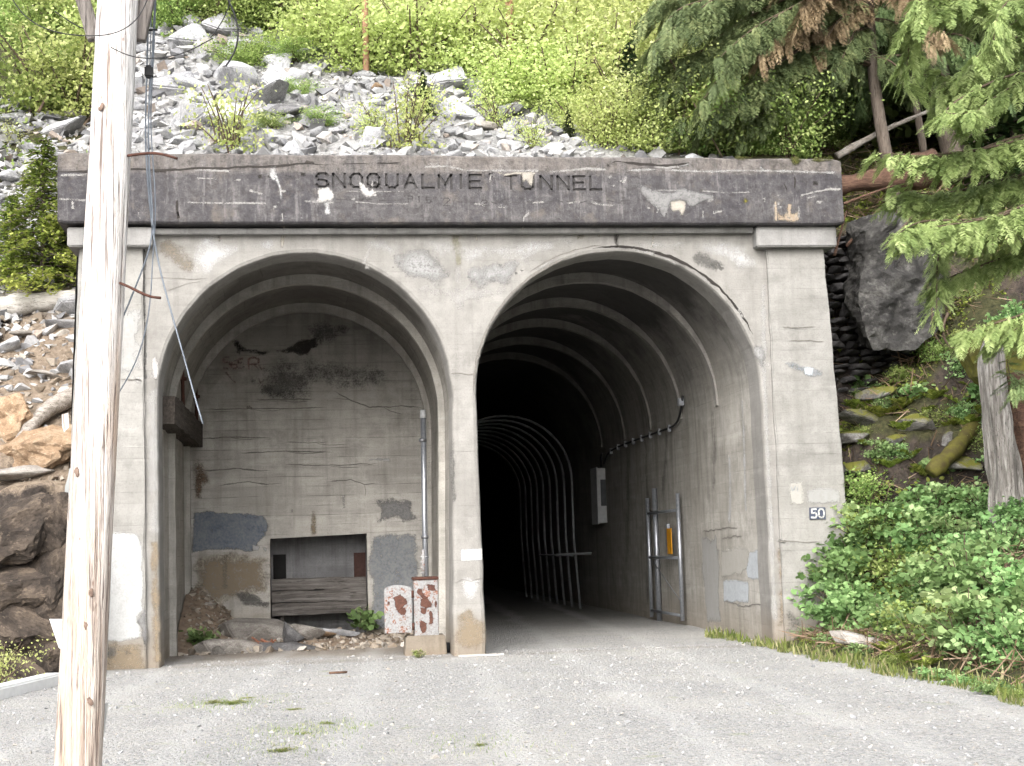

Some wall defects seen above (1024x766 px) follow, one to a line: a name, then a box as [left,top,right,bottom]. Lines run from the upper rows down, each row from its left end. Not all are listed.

spalling [306,187,334,214]
spalling [609,176,714,217]
water stain [262,323,384,399]
crack [213,393,420,414]
corrosion [195,461,208,498]
crack [203,437,376,495]